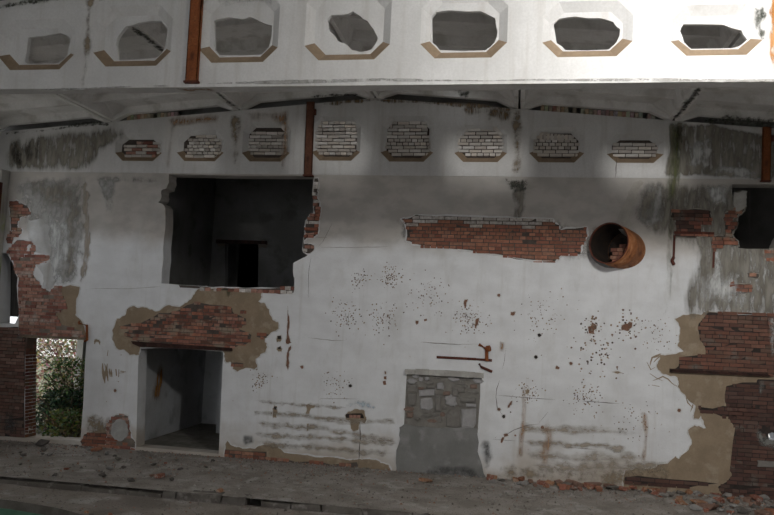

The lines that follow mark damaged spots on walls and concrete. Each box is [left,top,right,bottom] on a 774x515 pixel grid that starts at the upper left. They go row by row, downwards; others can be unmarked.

leakage [755,8,766,36]
leakage [6,121,121,169]
leakage [666,89,774,179]
leakage [19,179,90,283]
spalling [302,177,322,255]
peeling [400,214,589,263]
leakage [639,185,774,342]
peeling [671,191,747,252]
flaking render [0,199,101,438]
peeling [102,286,294,391]
peeling [80,413,136,450]
peeling [555,309,774,500]